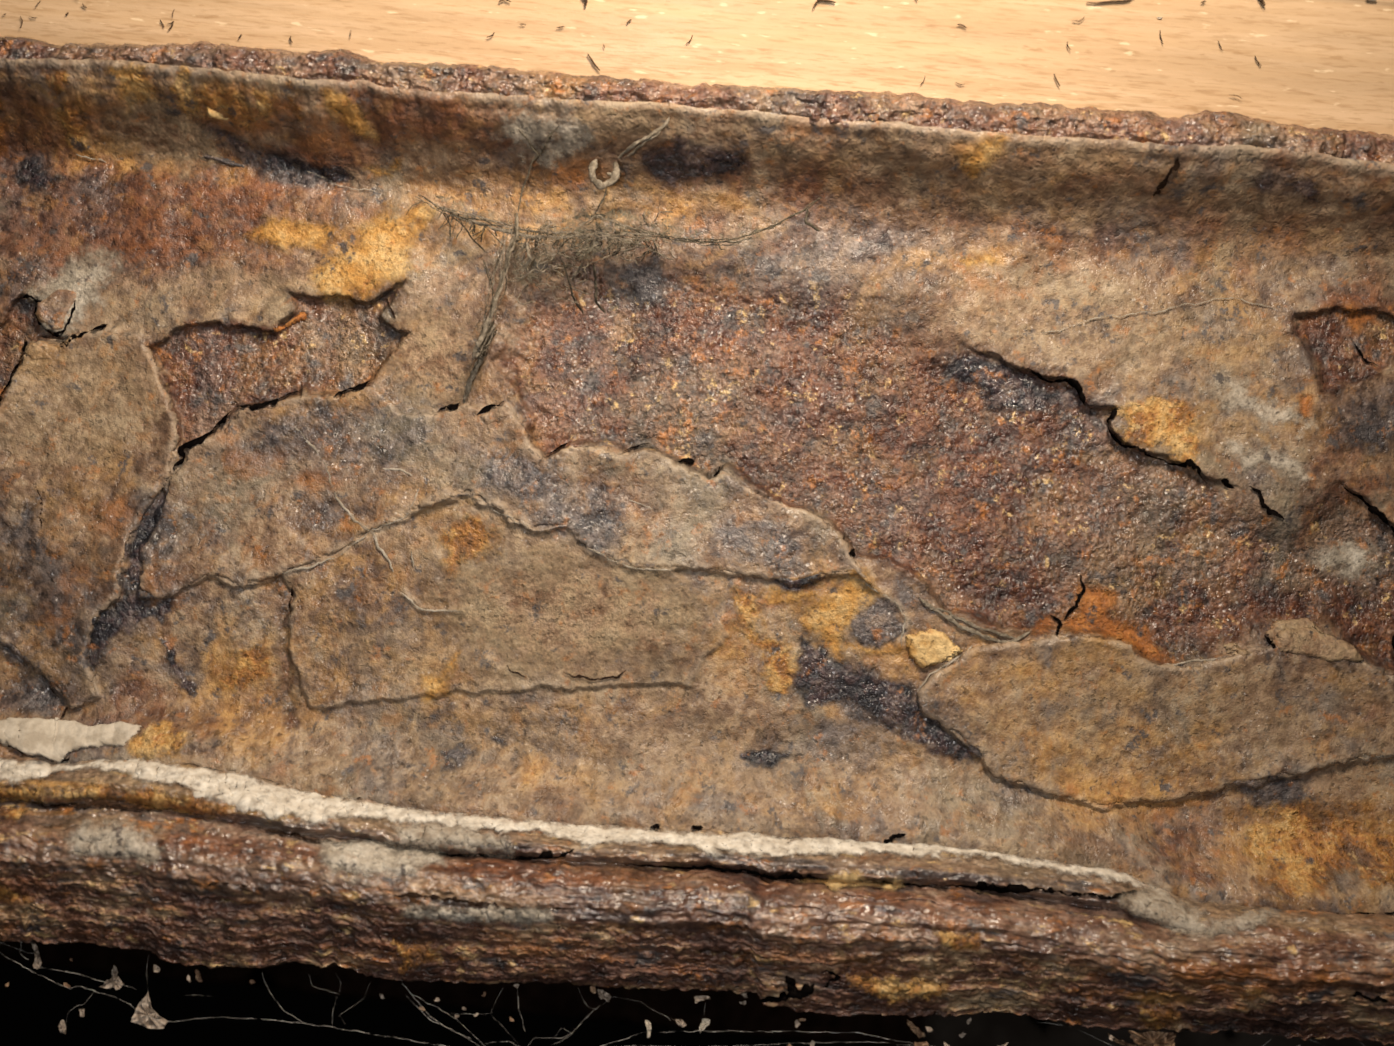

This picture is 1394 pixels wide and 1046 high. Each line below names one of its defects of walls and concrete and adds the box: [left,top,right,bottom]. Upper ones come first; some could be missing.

rust [251,205,437,301]
spalling [0,289,77,403]
crack [0,294,107,401]
crack [173,380,371,471]
spalling [146,278,406,449]
crack [438,401,504,415]
crack [1030,370,1284,519]
rust [1116,382,1199,463]
peeling [0,717,142,763]
rust [100,965,124,990]
rust [674,995,710,1034]
rust [849,975,943,1004]